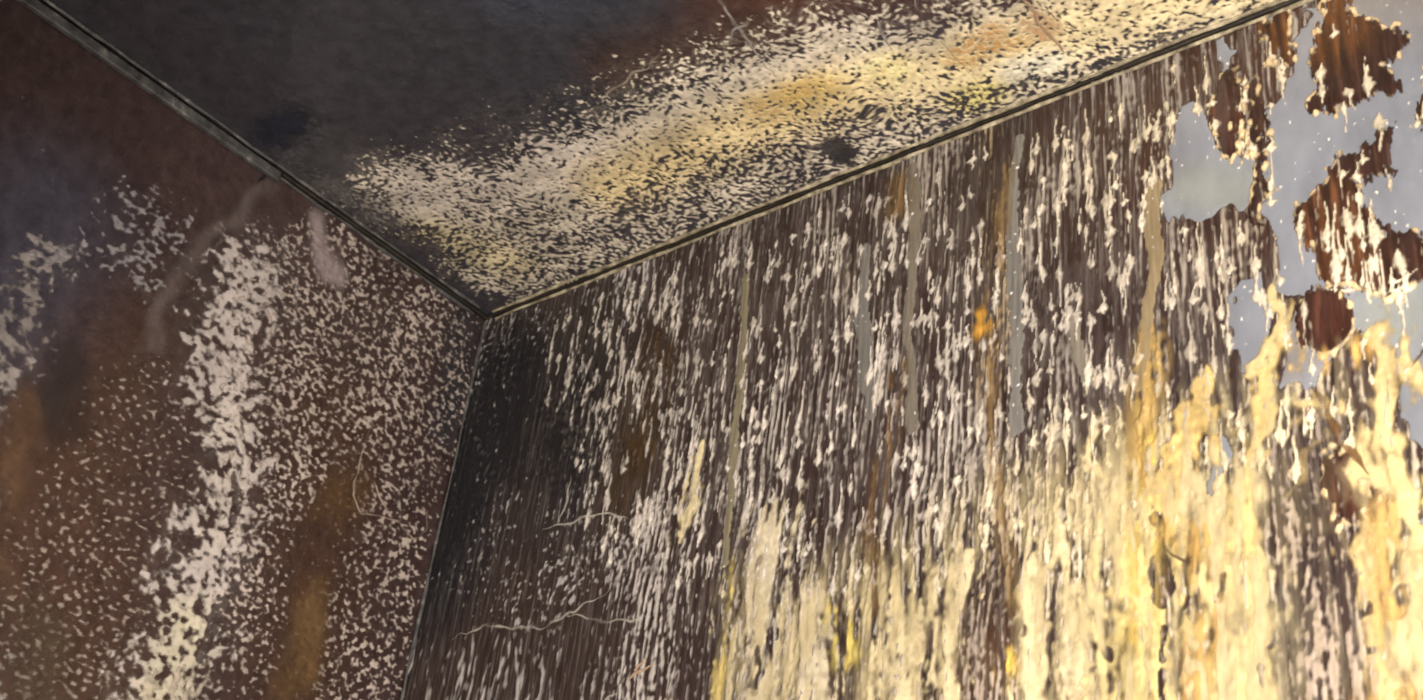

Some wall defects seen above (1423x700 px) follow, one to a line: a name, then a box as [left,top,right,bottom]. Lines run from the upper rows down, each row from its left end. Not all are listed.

damp [1346,3,1411,38]
damp [1305,47,1375,132]
damp [1373,112,1397,151]
peeling [1160,0,1423,390]
damp [1293,146,1417,383]
damp [203,0,1328,700]
damp [0,356,210,699]
peeling [1207,435,1233,496]
damp [1198,318,1387,700]
damp [1376,379,1420,498]
peeling [1400,382,1423,448]
damp [140,664,230,700]